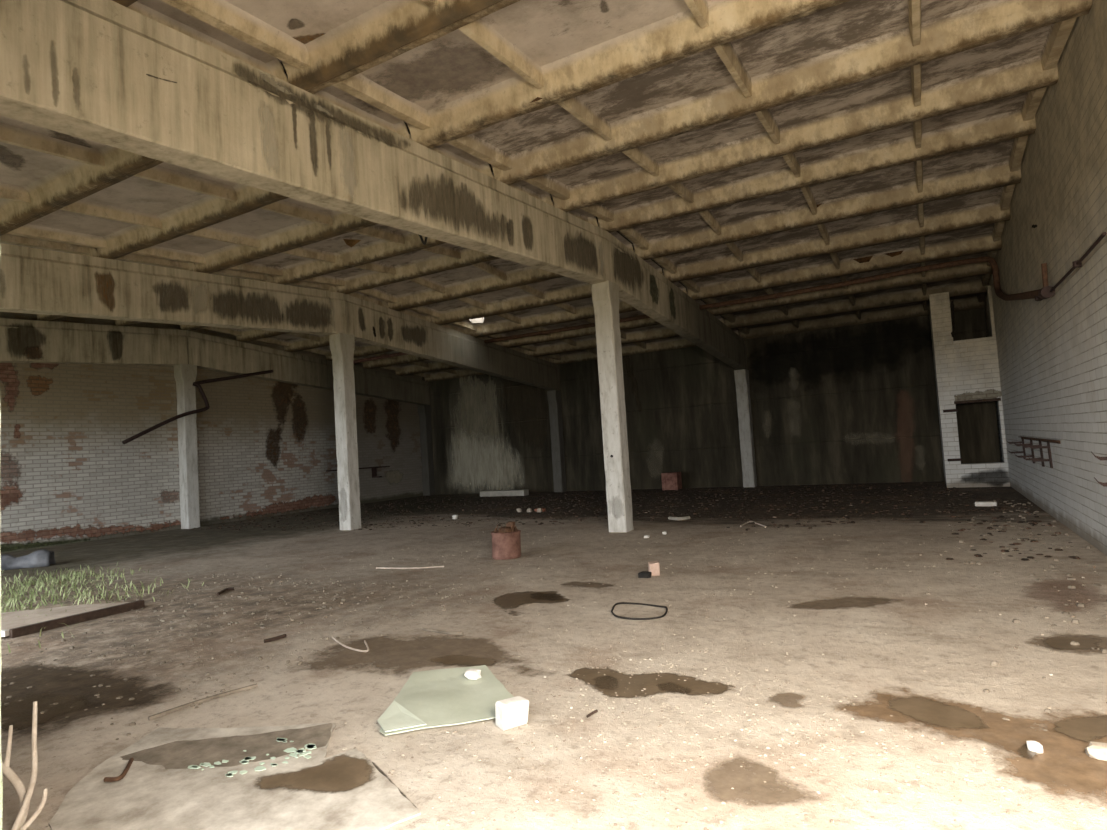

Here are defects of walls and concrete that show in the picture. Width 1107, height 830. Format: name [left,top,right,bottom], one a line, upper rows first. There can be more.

leakage [375,43,506,101]
leakage [51,130,90,148]
leakage [235,66,408,176]
leakage [402,176,533,250]
leakage [213,290,332,329]
leakage [8,324,45,359]
flaking render [0,363,58,412]
leakage [449,375,548,490]
flaking render [0,450,23,511]
flaking render [161,490,179,503]
flaking render [220,494,337,520]
flaking render [0,520,181,544]